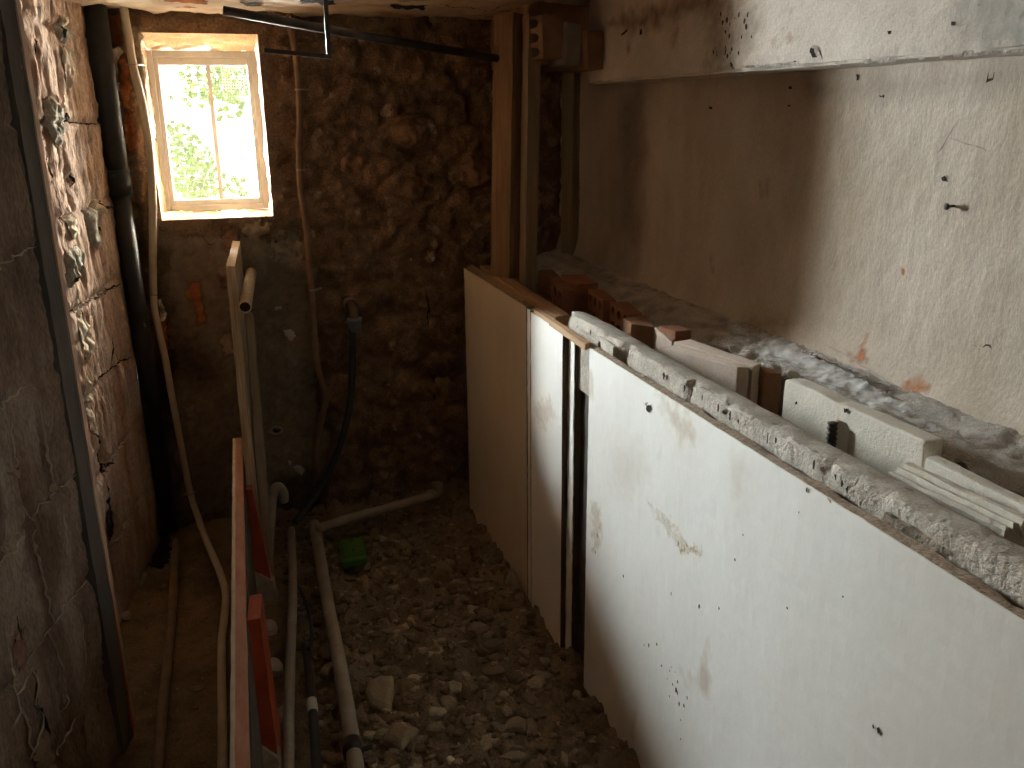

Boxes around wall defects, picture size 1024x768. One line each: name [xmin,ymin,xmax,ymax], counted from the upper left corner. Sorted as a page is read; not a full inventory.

crack [96,341,133,381]
crack [0,386,136,768]